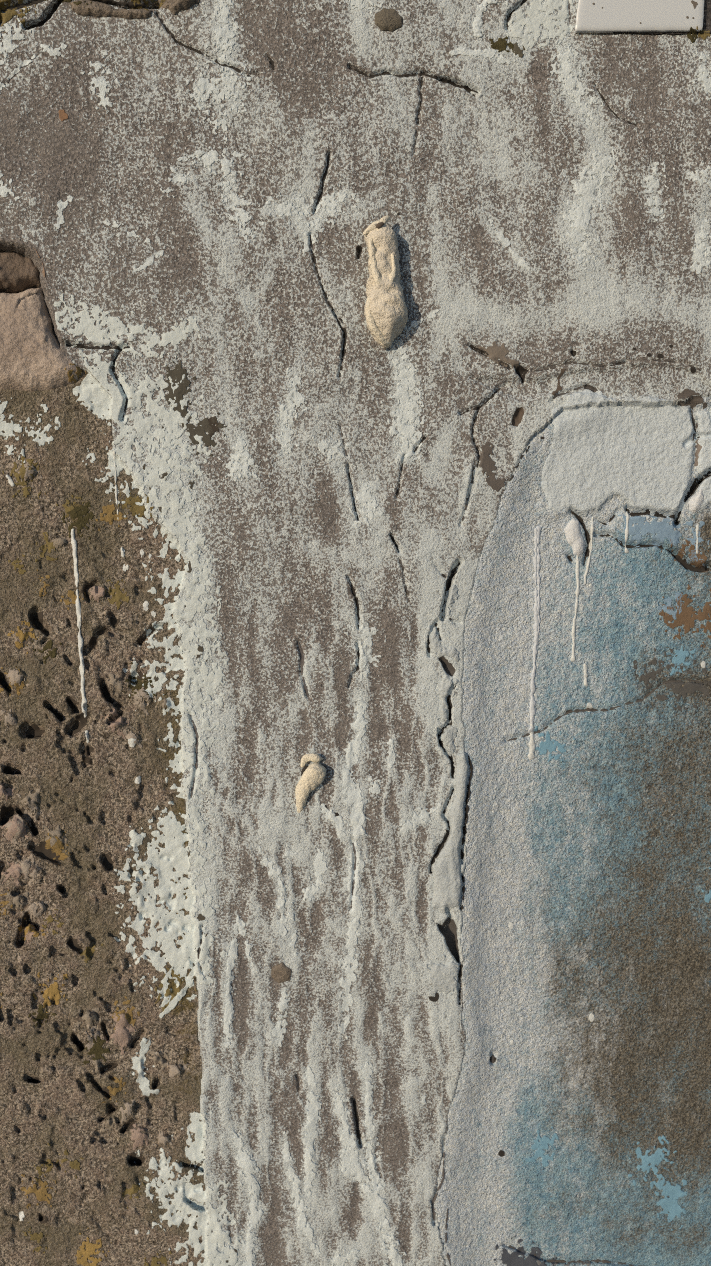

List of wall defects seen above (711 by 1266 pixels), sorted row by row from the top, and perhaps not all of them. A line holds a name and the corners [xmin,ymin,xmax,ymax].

leakage [80,50,120,121]
crack [0,0,274,85]
leakage [160,0,361,253]
crack [350,68,478,154]
spalling [0,248,46,293]
crack [310,155,347,377]
leakage [381,308,441,465]
crack [568,468,711,572]
crack [427,562,460,653]
leakage [320,620,396,1040]
crack [430,685,473,912]
leakage [279,1062,406,1266]